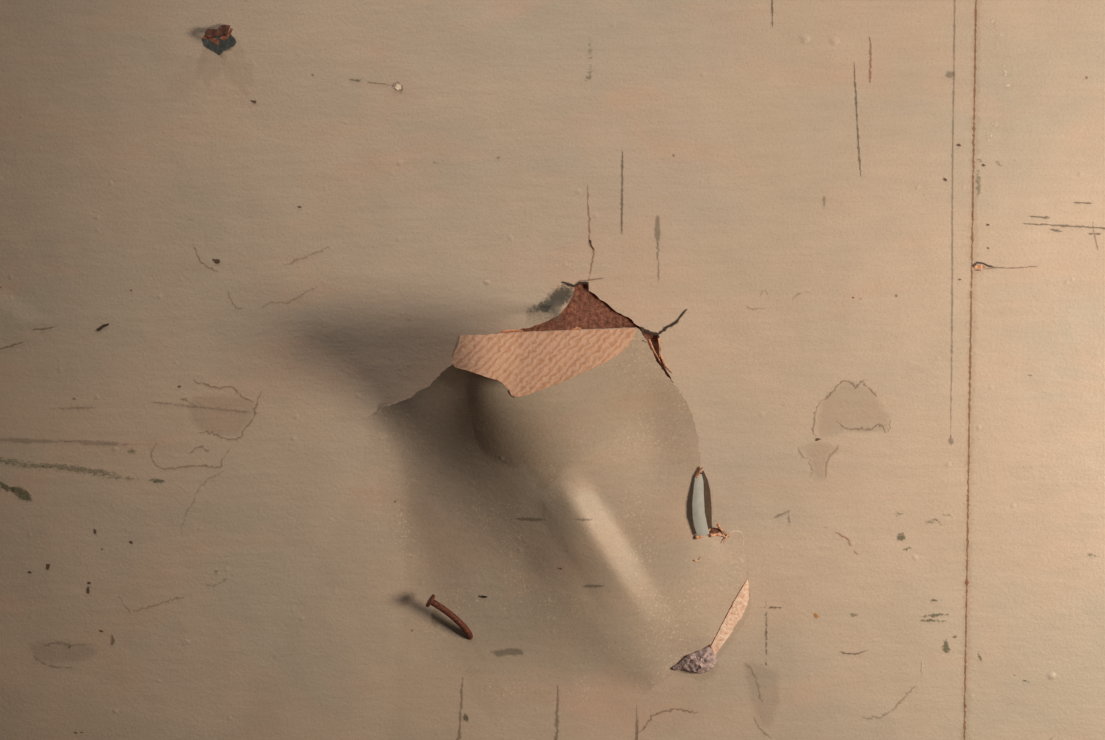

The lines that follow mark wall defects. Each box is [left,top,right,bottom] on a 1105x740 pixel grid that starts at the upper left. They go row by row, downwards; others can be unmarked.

spalling [530,288,574,319]
crack [641,309,688,351]